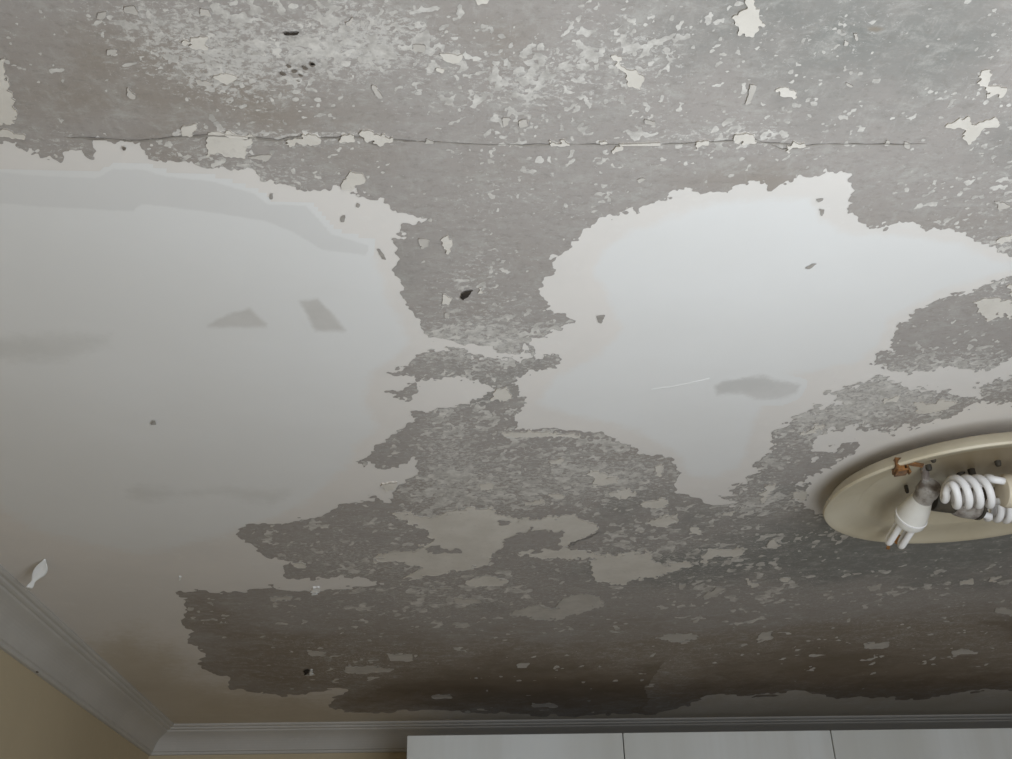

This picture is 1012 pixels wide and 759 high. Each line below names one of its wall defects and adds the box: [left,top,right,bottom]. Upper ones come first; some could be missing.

crack [65,129,913,154]
peeling [0,0,1012,358]
peeling [870,276,1012,375]
water stain [706,368,807,407]
peeling [26,559,48,590]
peeling [175,346,1012,710]